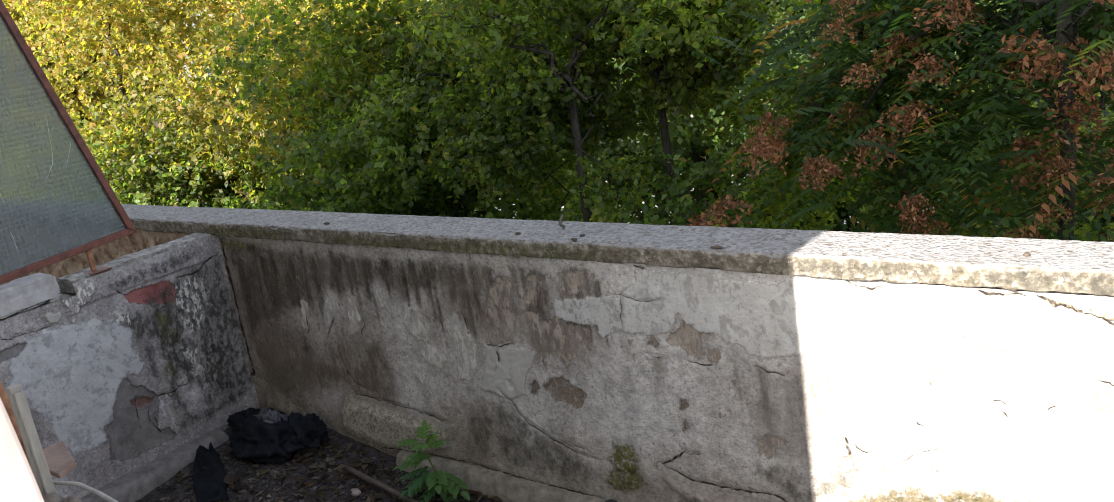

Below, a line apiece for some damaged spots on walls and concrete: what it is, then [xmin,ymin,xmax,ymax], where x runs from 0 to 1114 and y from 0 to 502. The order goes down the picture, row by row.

peeling [0,229,190,461]
damp [107,245,600,427]
flaking render [403,269,1114,409]
crack [977,290,1114,326]
crack [347,371,449,423]
crack [499,390,599,460]
crack [661,451,787,502]